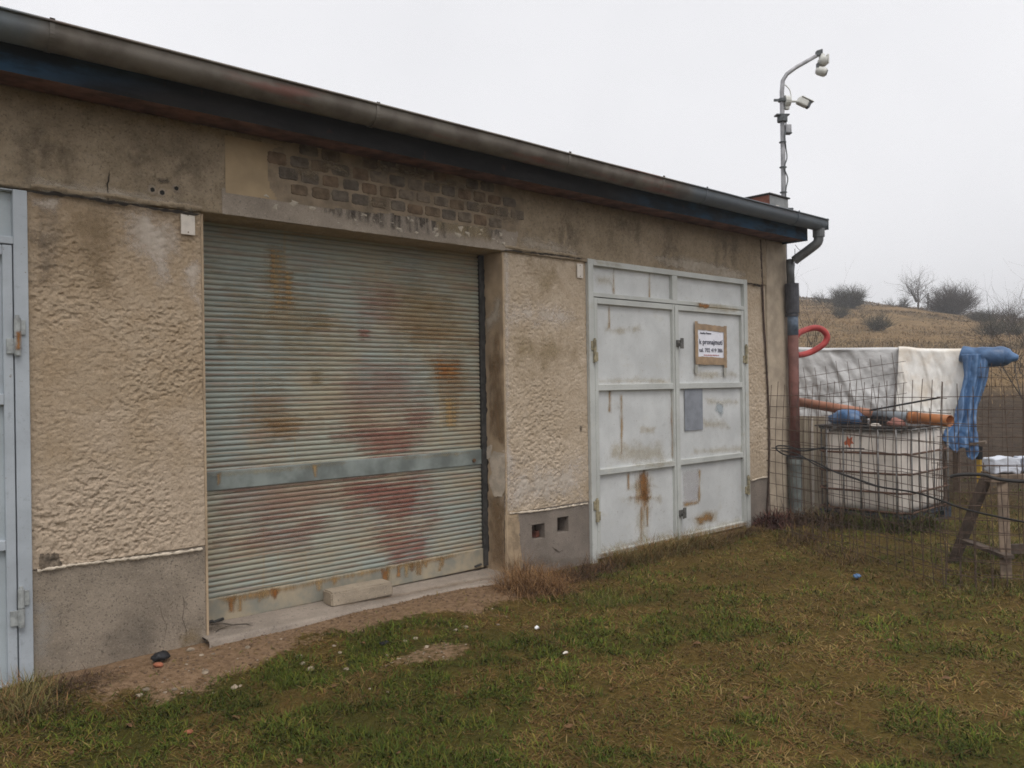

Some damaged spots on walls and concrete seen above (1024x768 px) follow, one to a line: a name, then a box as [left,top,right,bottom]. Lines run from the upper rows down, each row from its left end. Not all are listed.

crack [27,170,202,216]
spalling [263,143,524,245]
corrosion [628,472,651,527]
corrosion [697,514,745,534]
corrosion [226,586,294,612]